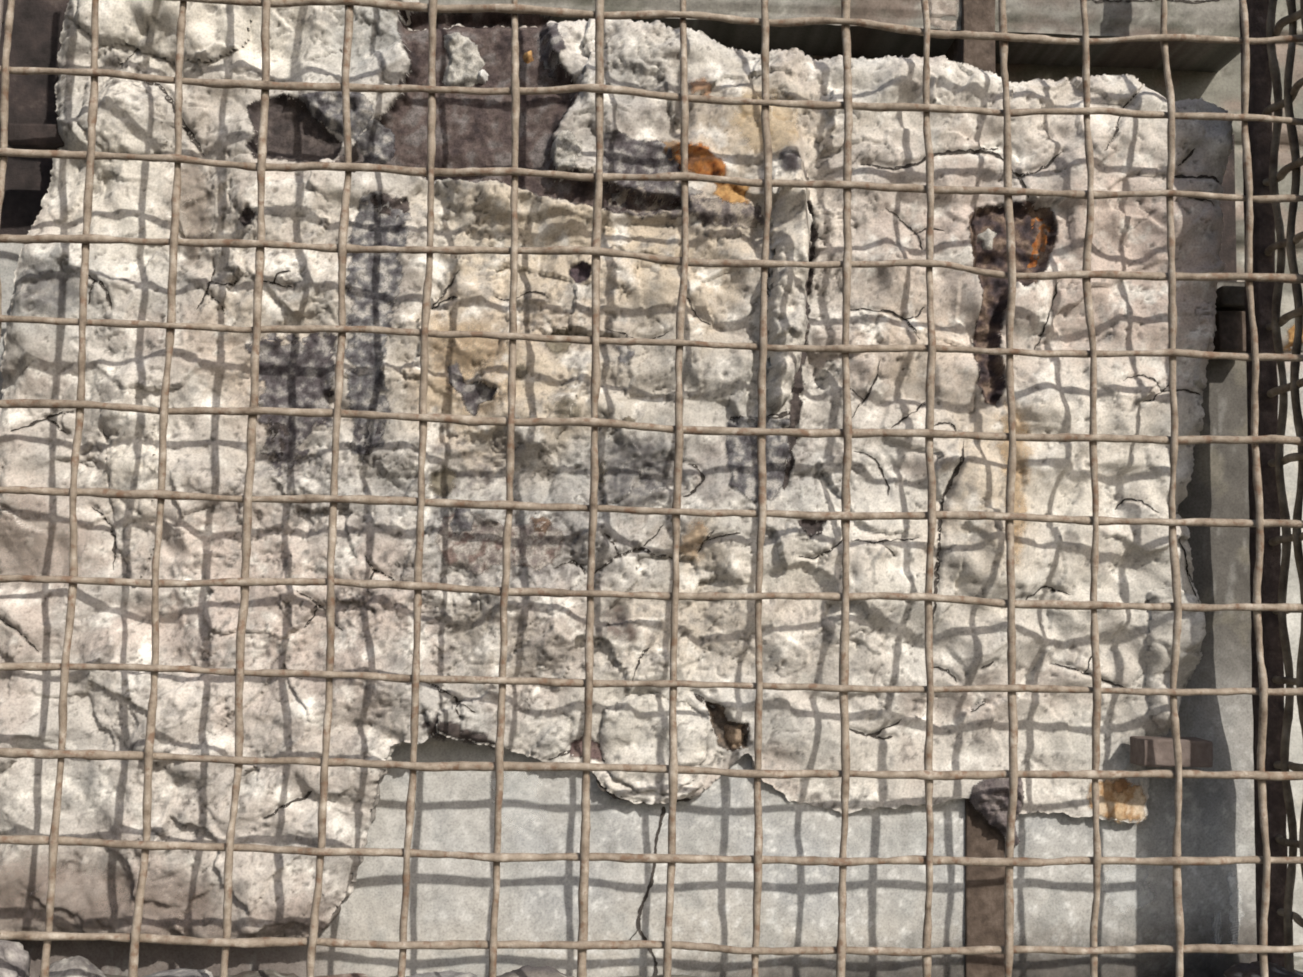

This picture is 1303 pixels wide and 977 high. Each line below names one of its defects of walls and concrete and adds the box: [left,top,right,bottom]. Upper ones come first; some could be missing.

spalling [246,4,764,229]
corrosion [663,141,750,203]
crack [861,147,1063,201]
spalling [245,191,414,477]
crack [729,200,819,490]
crack [850,307,925,339]
spalling [969,201,1058,406]
crack [1123,374,1200,402]
spalling [725,416,791,503]
spalling [707,702,750,751]
corrosion [1087,778,1146,822]
crack [593,774,691,976]